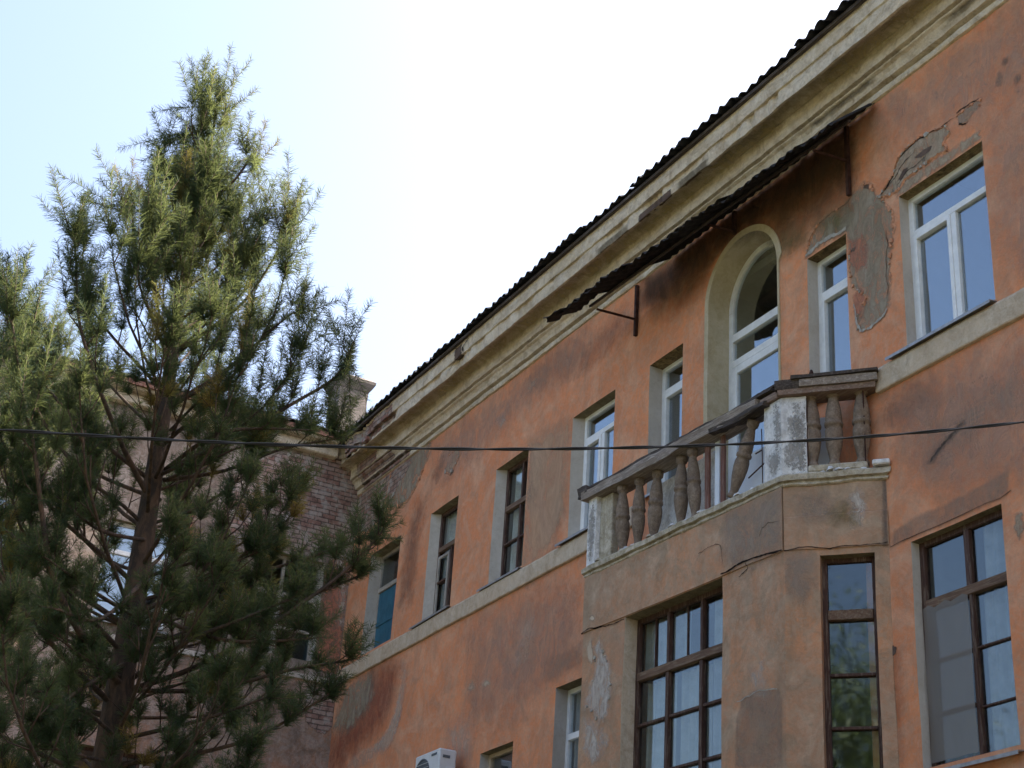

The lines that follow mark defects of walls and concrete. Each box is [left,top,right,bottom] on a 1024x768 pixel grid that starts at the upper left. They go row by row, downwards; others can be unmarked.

flaking render [805,98,982,332]
crack [698,521,887,577]
flaking render [584,640,612,762]